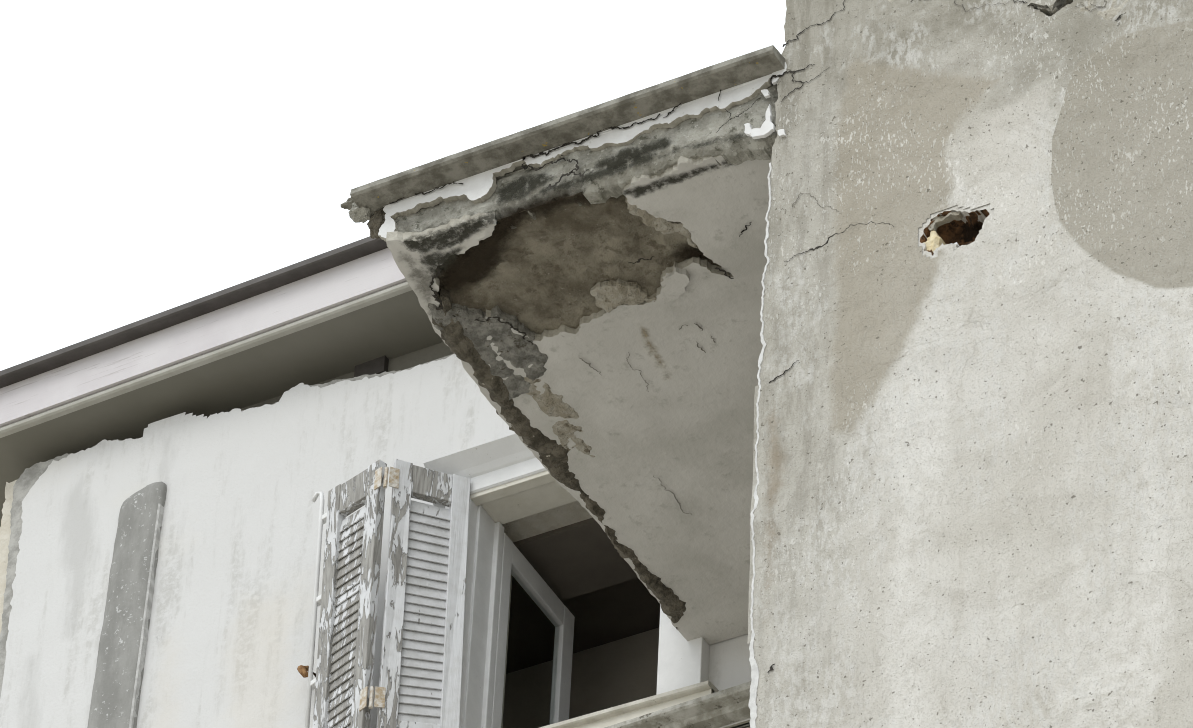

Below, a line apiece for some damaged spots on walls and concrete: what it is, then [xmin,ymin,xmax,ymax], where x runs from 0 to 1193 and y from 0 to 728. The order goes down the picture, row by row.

crack [954,0,1034,12]
crack [1075,0,1123,21]
peeling [378,62,787,241]
crack [787,193,894,262]
spalling [428,191,721,458]
water stain [747,13,1193,648]
peeling [748,163,772,728]